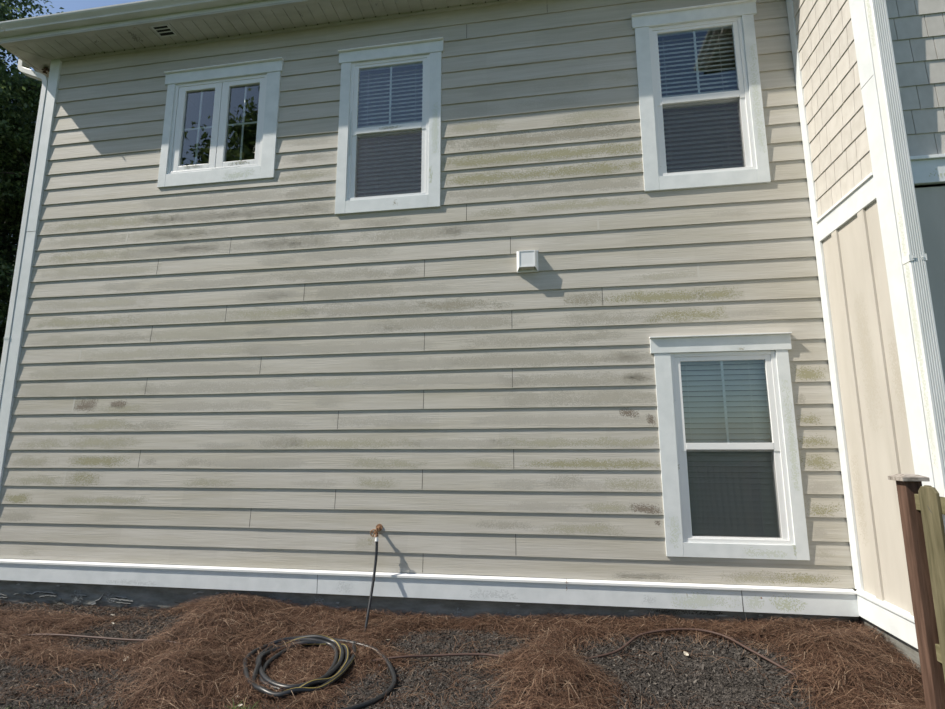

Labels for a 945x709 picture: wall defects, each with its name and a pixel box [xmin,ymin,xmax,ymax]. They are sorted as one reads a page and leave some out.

mould [441,124,641,151]
mould [607,572,687,581]